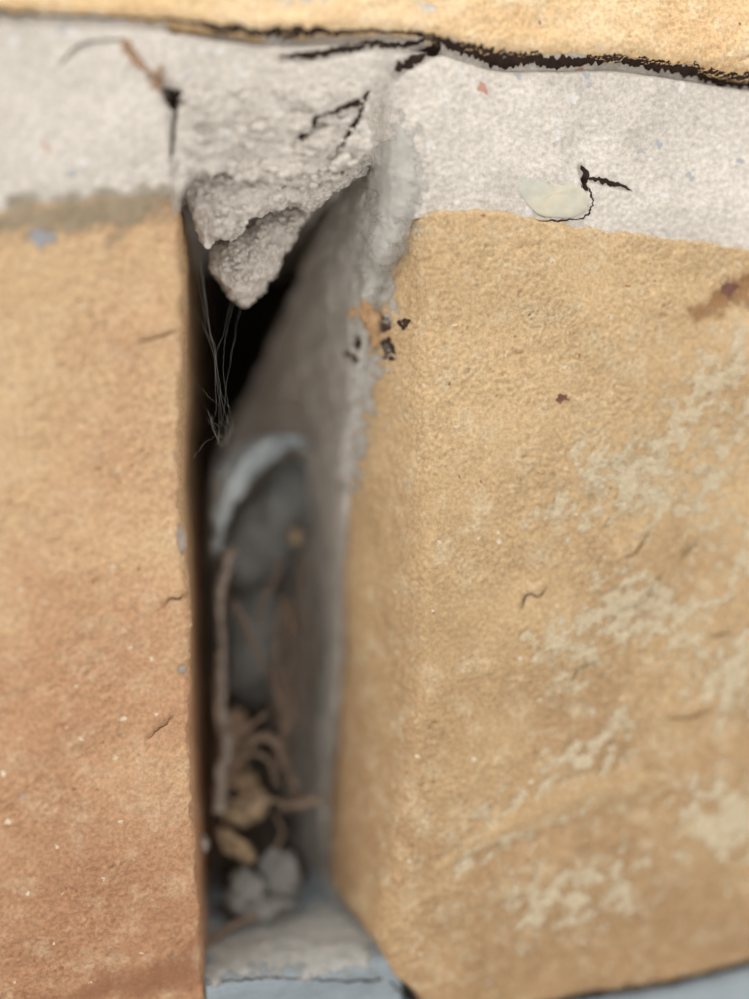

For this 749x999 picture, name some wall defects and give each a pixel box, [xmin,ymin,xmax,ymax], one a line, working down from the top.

crack [169,103,178,158]
crack [536,165,632,222]
peeling [229,80,429,492]